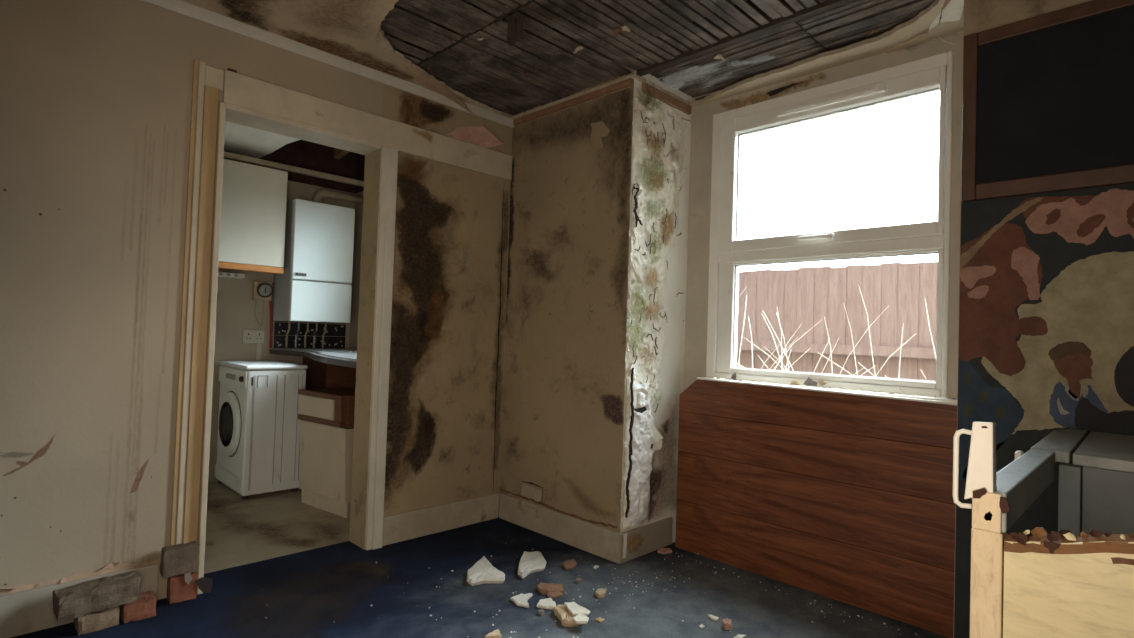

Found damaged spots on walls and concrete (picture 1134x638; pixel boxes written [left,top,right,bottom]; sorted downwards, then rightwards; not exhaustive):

water stain [221,0,263,28]
water stain [281,31,412,79]
flaking render [376,30,395,55]
flaking render [883,0,964,53]
flaking render [403,64,476,117]
water stain [385,160,451,498]
peeling [620,90,691,558]
peeling [0,560,158,595]